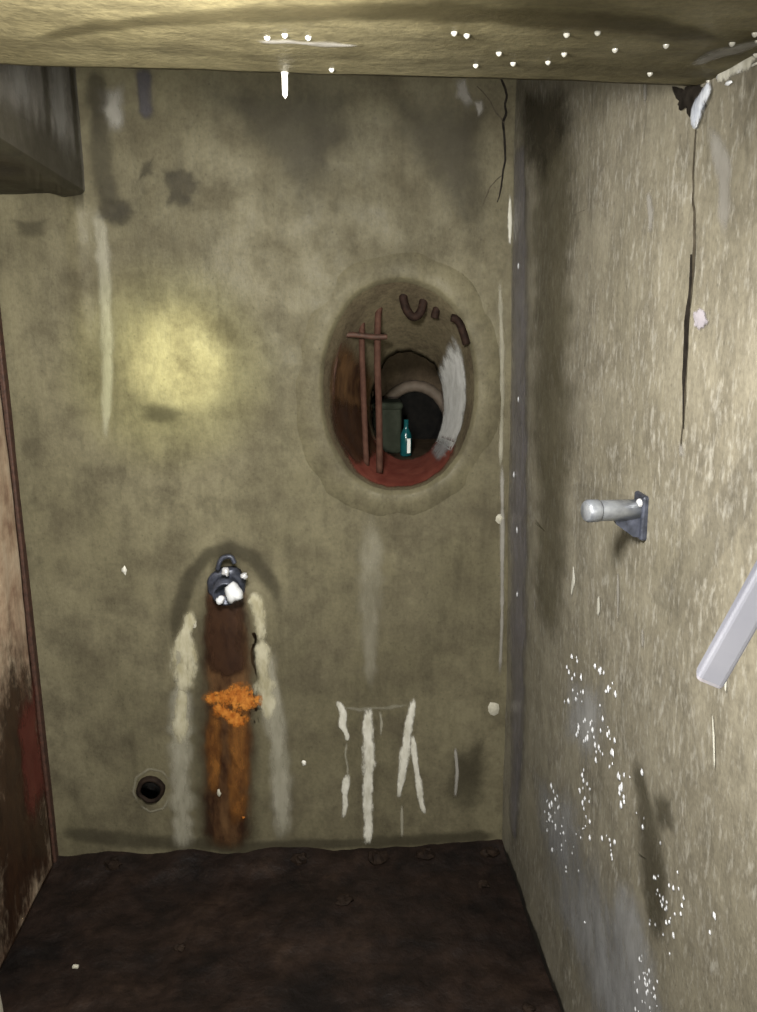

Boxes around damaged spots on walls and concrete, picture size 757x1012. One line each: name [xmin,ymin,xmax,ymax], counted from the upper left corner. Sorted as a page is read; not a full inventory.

crack [477,79,508,207]
water stain [99,233,111,425]
crack [679,129,707,454]
water stain [509,94,566,837]
rust [173,543,277,627]
rust [204,593,261,846]
water stain [73,594,486,853]
water stain [570,693,596,745]
water stain [504,849,564,1012]
water stain [542,792,573,859]
water stain [563,870,654,1012]
water stain [636,773,668,930]